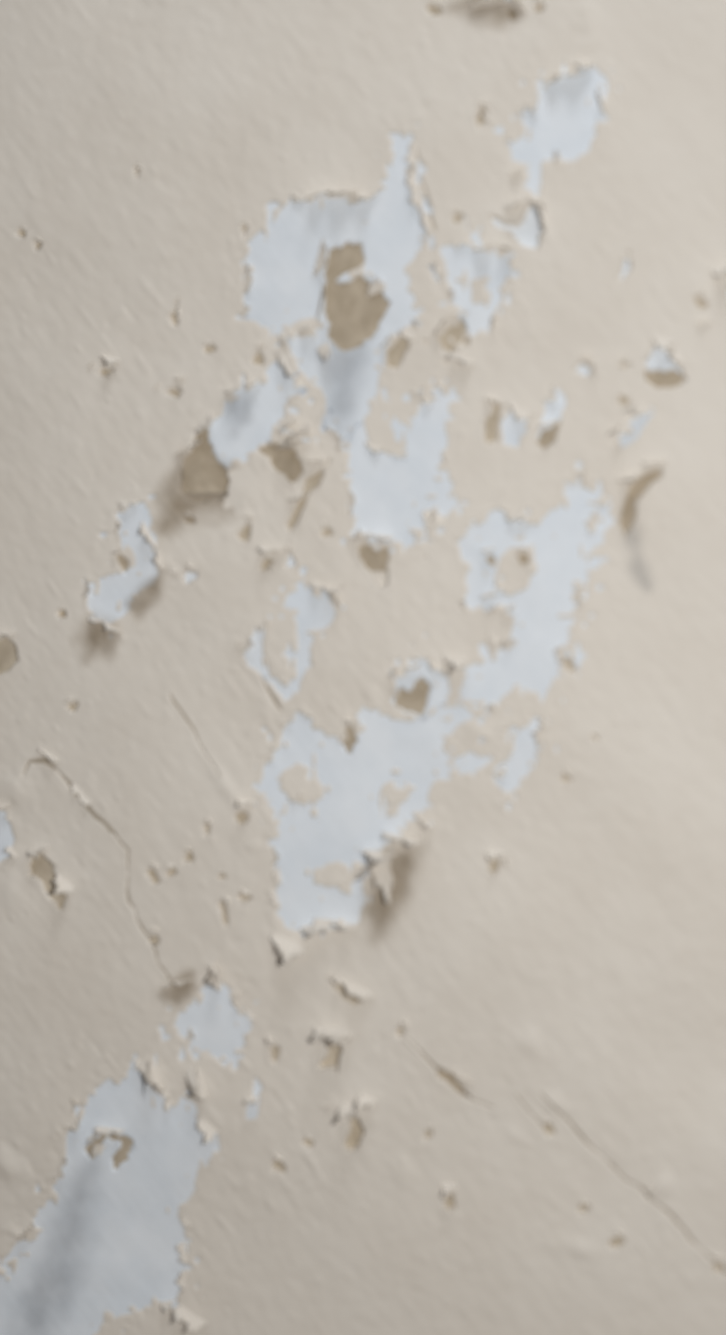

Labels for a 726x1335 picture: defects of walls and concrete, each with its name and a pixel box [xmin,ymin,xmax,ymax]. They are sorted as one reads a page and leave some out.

peeling [645,337,685,388]
peeling [82,487,197,640]
peeling [175,59,667,966]
crack [25,748,172,984]
peeling [0,959,279,1335]